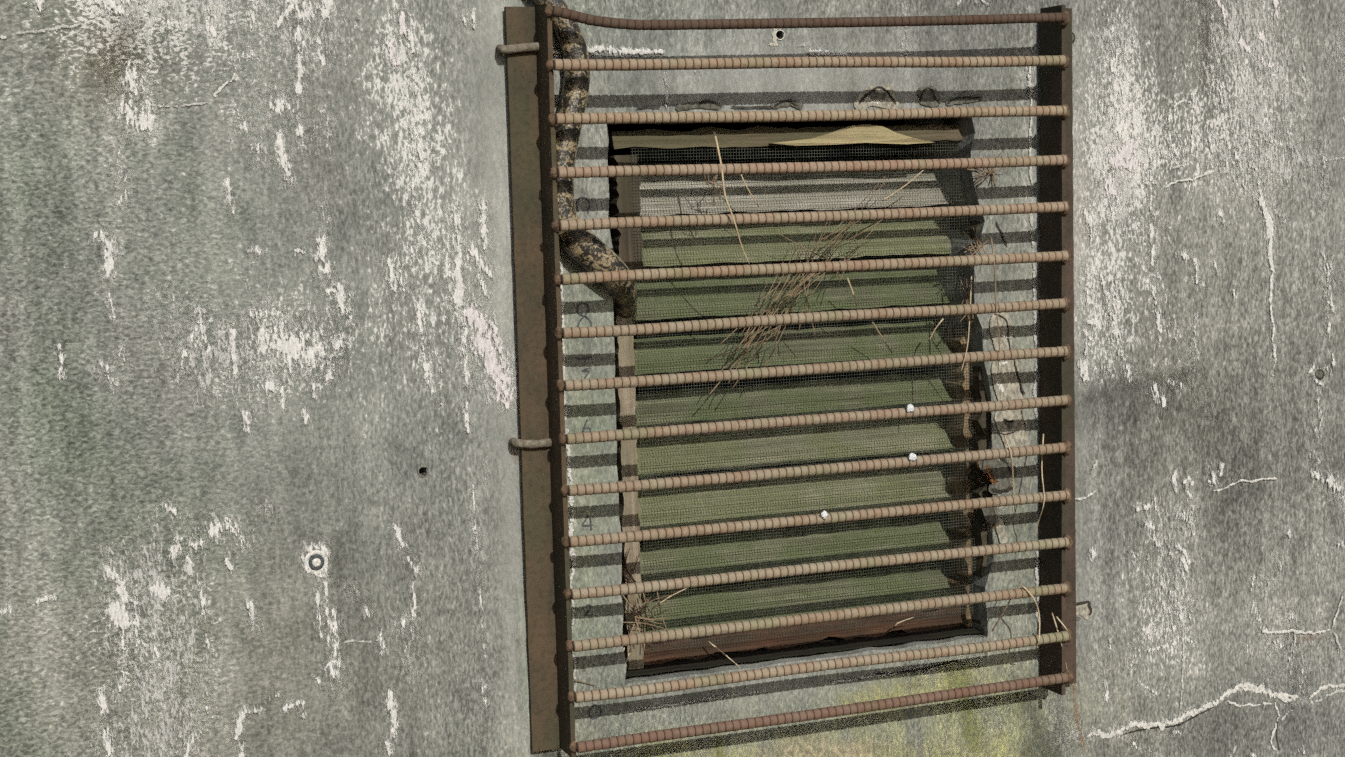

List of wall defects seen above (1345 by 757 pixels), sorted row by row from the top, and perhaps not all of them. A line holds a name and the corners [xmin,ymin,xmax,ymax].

crack [0,21,91,39]
crack [1259,596,1343,653]
crack [1072,630,1345,751]